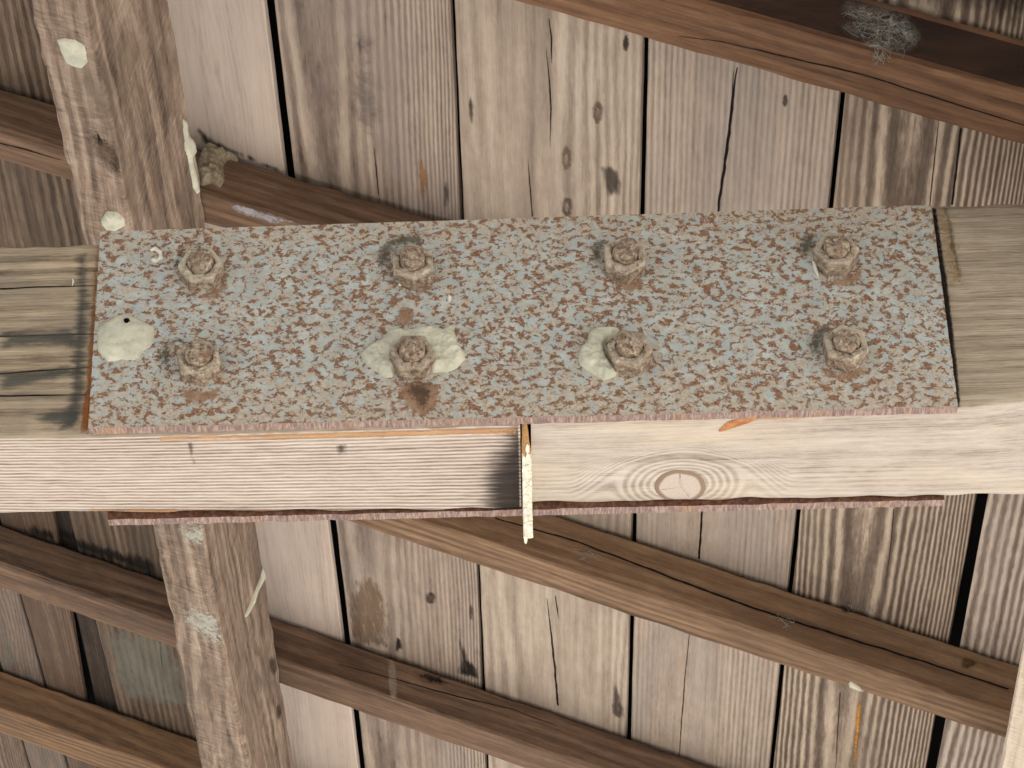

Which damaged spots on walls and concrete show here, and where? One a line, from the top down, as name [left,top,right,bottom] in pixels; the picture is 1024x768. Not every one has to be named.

crack [545,21,553,134]
crack [679,36,1024,212]
rust [82,275,97,431]
rust [178,387,220,403]
rust [398,382,440,415]
rust [933,209,960,406]
leakage [351,579,401,651]
crack [340,596,559,725]
crack [494,509,1009,690]